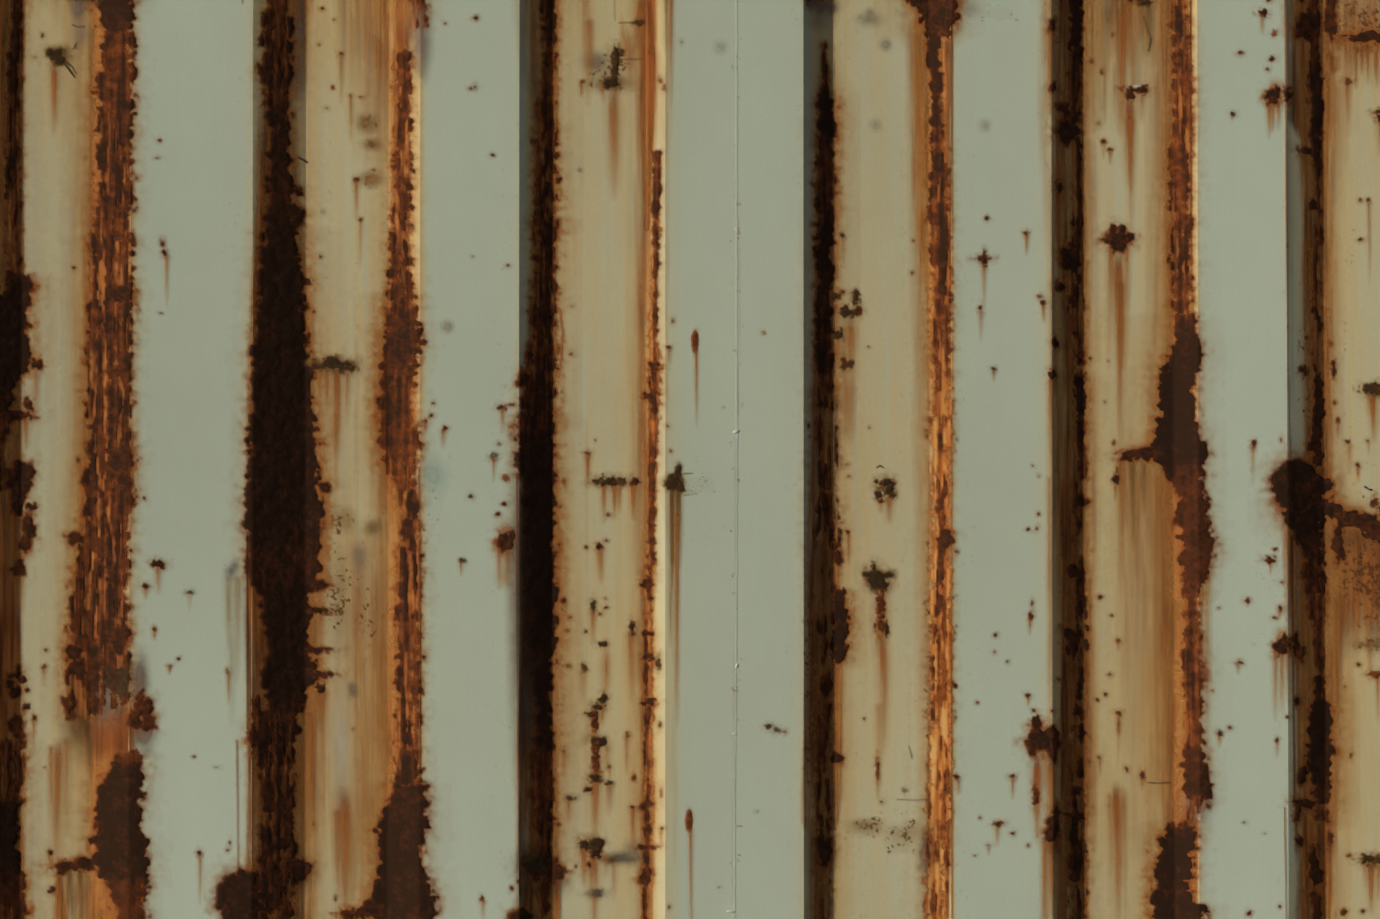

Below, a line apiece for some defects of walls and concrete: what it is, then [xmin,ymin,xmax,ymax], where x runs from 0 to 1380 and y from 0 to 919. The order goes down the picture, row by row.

corrosion [0,0,165,919]
corrosion [213,0,338,919]
corrosion [329,0,448,919]
corrosion [490,0,608,919]
corrosion [804,41,856,919]
corrosion [903,0,964,919]
corrosion [1025,0,1113,919]
corrosion [1111,0,1232,919]
corrosion [1258,0,1380,919]